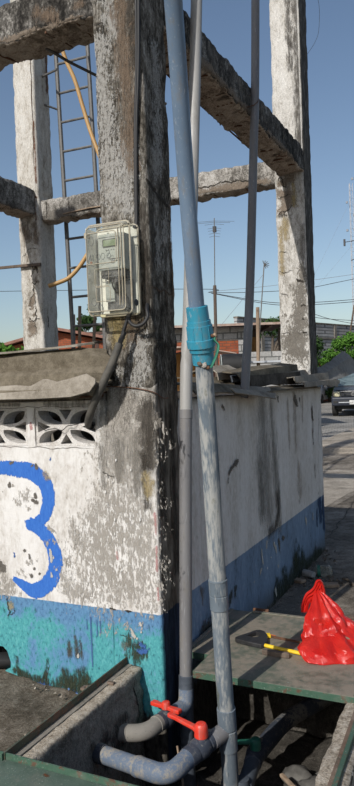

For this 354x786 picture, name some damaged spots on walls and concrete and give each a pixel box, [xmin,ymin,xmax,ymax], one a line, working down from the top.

spalling [200,57,251,147]
crack [198,177,293,214]
crack [22,248,49,336]
water stain [94,0,179,575]
peeling [2,482,38,510]
peeling [46,390,172,643]
water stain [258,397,285,552]
water stain [317,492,325,532]
peeling [0,549,41,600]
water stain [273,544,322,605]
water stain [12,617,101,694]
water stain [122,632,148,666]